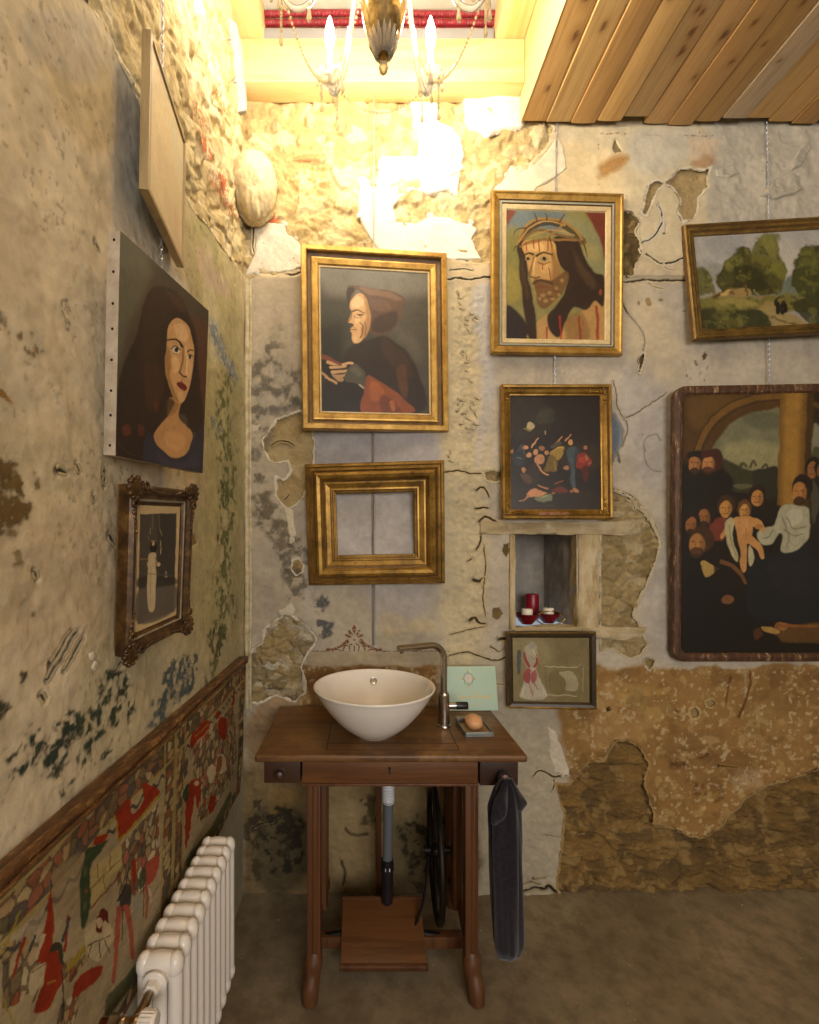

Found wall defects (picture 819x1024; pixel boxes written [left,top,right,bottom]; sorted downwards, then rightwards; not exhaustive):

flaking render [85,0,567,281]
crack [623,205,685,350]
spalling [623,165,714,278]
spalling [251,410,316,544]
crack [444,468,506,686]
spalling [598,488,662,672]
water stain [0,701,10,720]
water stain [6,670,136,777]
spalling [252,603,318,705]
water stain [245,800,305,878]
spalling [548,727,819,894]